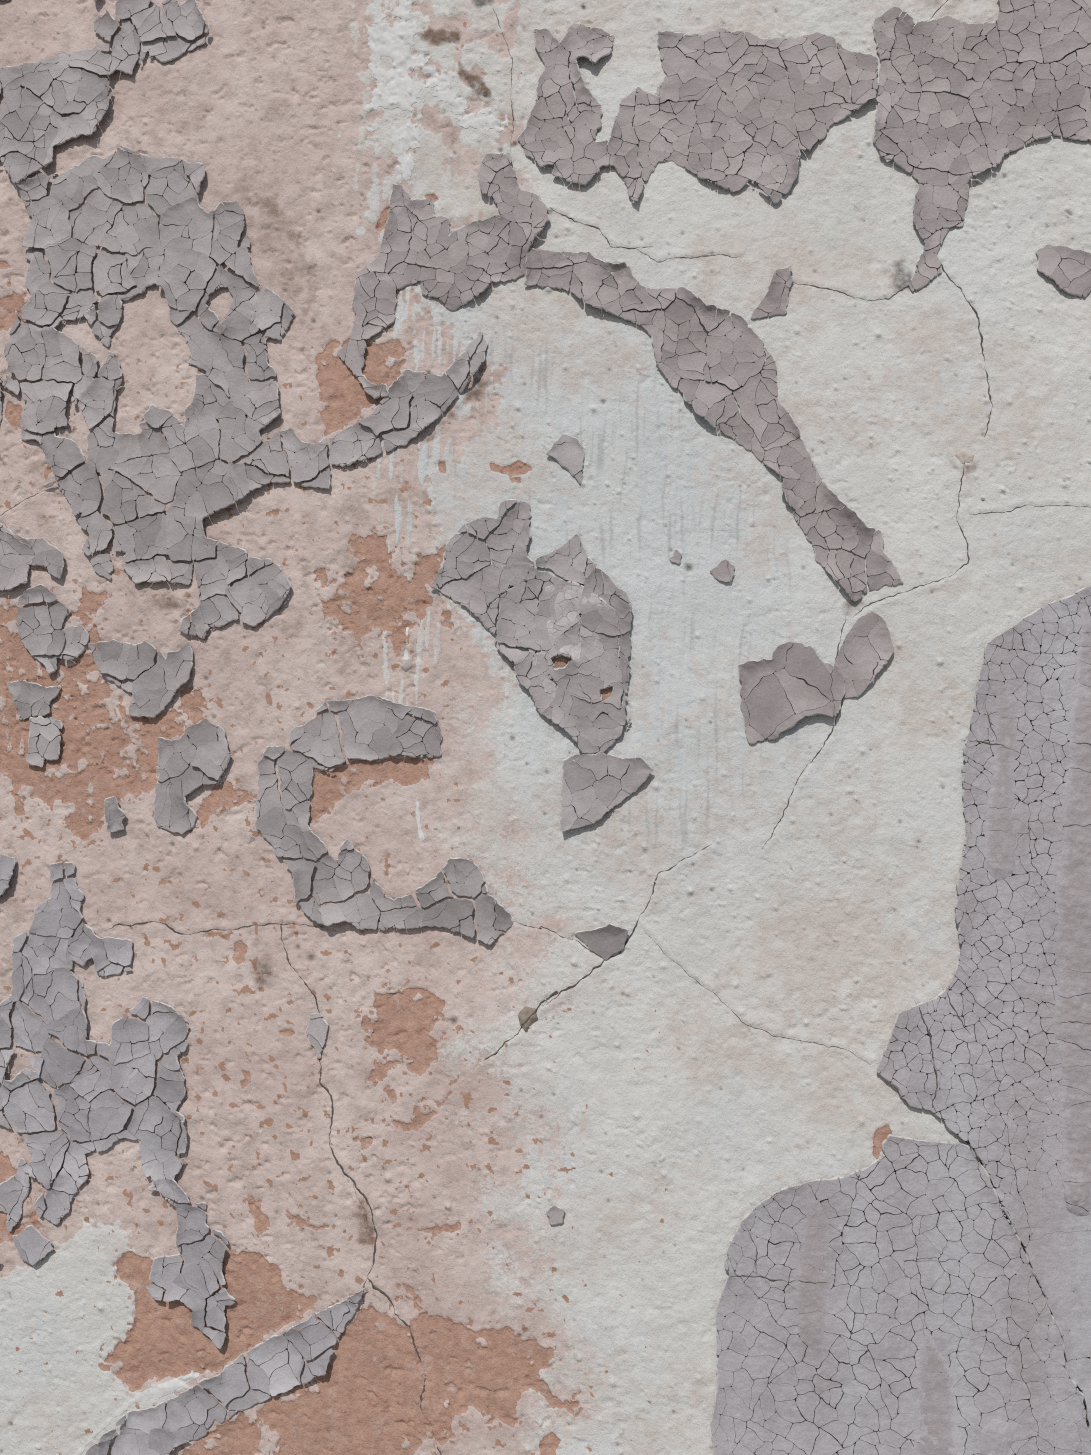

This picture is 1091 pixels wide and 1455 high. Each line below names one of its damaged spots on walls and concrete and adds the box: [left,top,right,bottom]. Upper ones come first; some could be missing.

crack [794,282,909,301]
peeling [0,0,1091,945]
crack [835,264,1091,660]
crack [763,700,843,847]
crack [969,703,1010,749]
crack [110,920,323,1013]
crack [478,845,867,1063]
peeling [710,586,1091,1455]
crack [914,987,971,1108]
spalling [0,861,583,1455]
crack [319,1059,442,1455]